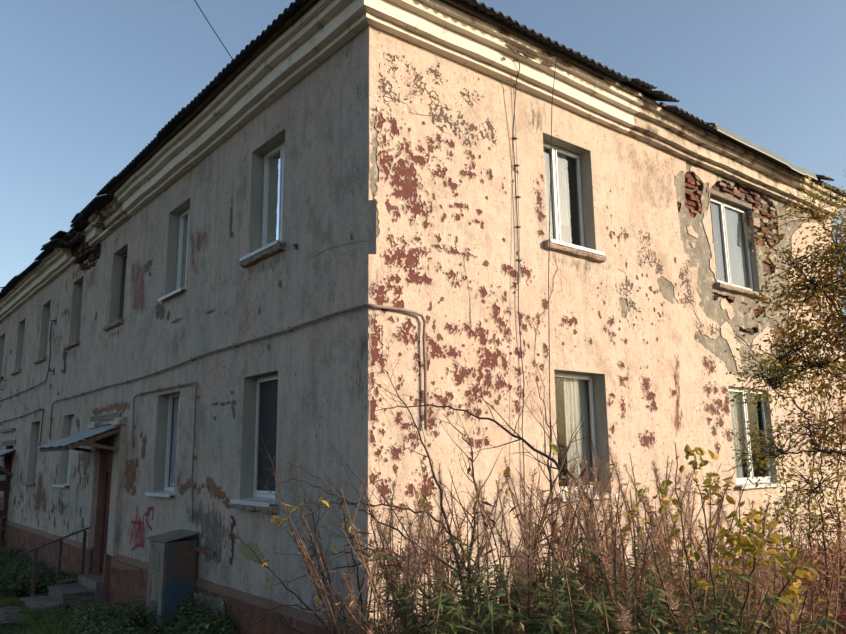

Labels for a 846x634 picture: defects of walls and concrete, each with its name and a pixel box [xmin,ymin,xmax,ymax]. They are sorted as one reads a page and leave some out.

spalling [71,238,102,275]
peeling [369,99,550,589]
peeling [558,311,578,335]
peeling [598,298,628,345]
spalling [626,161,821,454]
peeling [607,360,631,444]
peeling [124,430,146,495]
peeling [177,474,235,565]